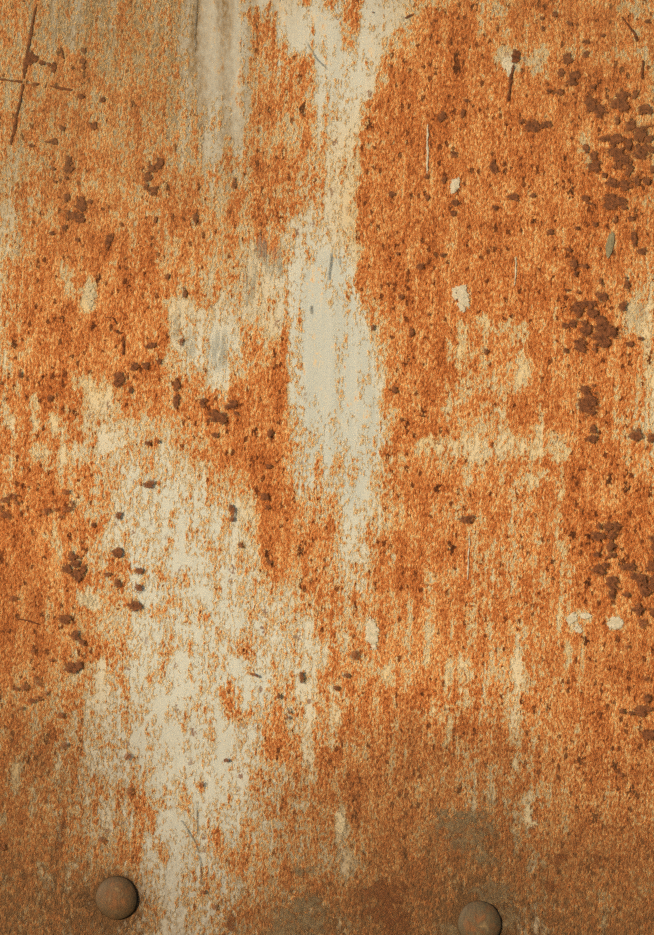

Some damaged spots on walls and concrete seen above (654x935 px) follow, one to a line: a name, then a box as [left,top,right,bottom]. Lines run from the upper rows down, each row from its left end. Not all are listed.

corrosion [297,0,317,19]
corrosion [318,0,368,107]
corrosion [333,320,353,374]
corrosion [357,369,374,400]
corrosion [603,521,621,552]
corrosion [591,563,609,576]
corrosion [605,576,619,599]
corrosion [630,572,654,598]
corrosion [127,537,198,705]
corrosion [633,705,653,717]
corrosion [641,729,654,743]
corrosion [478,793,654,935]